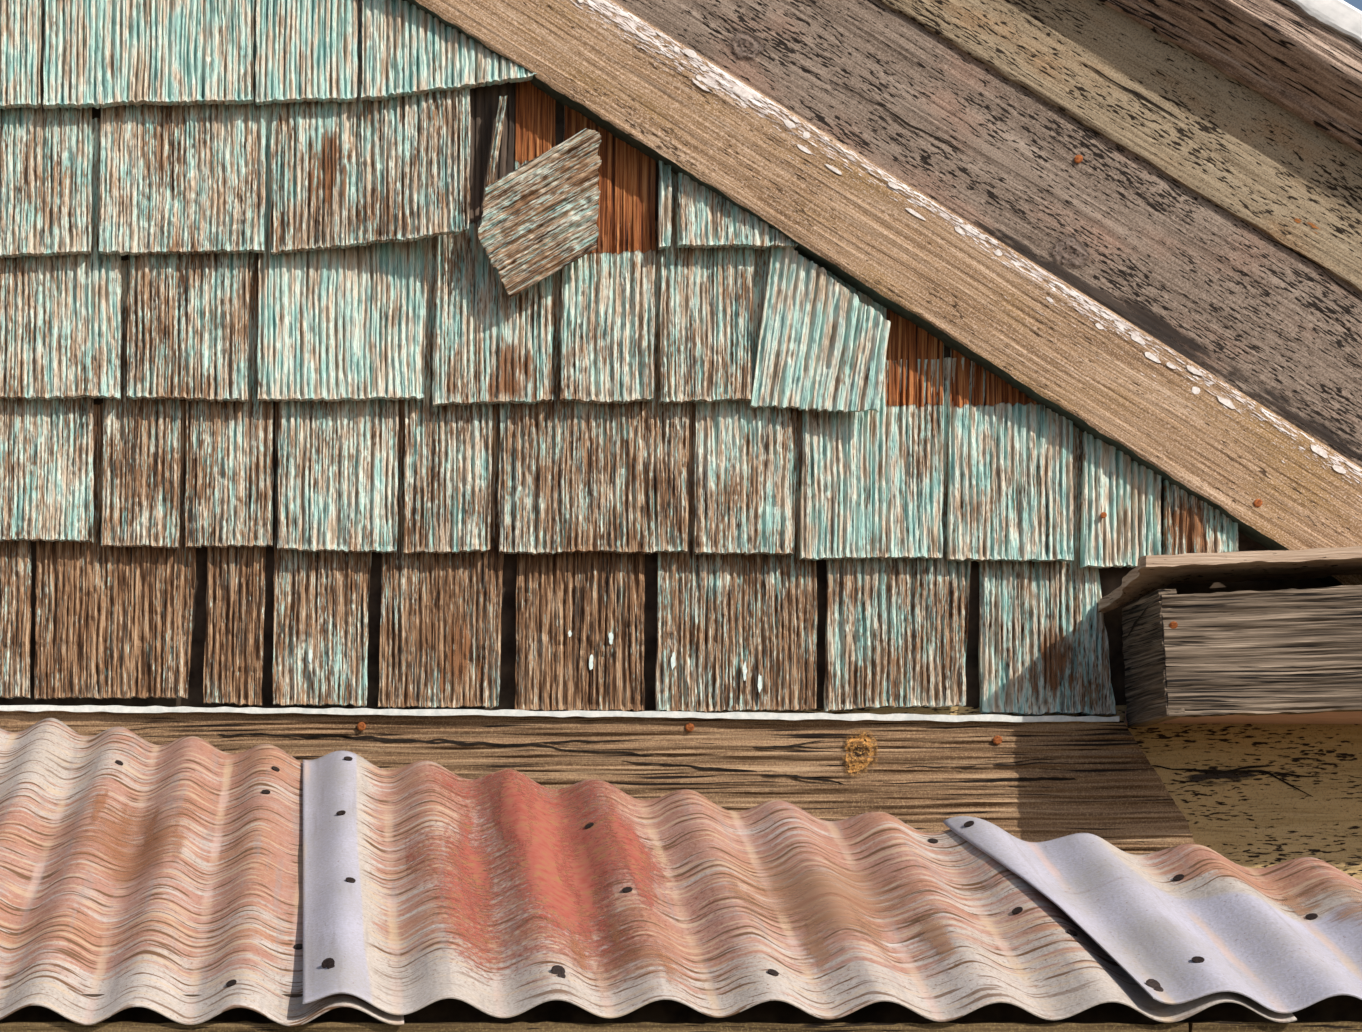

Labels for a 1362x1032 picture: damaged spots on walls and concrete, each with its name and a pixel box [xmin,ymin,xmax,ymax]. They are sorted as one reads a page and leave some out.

peeling [469,81,656,254]
peeling [558,0,1362,517]